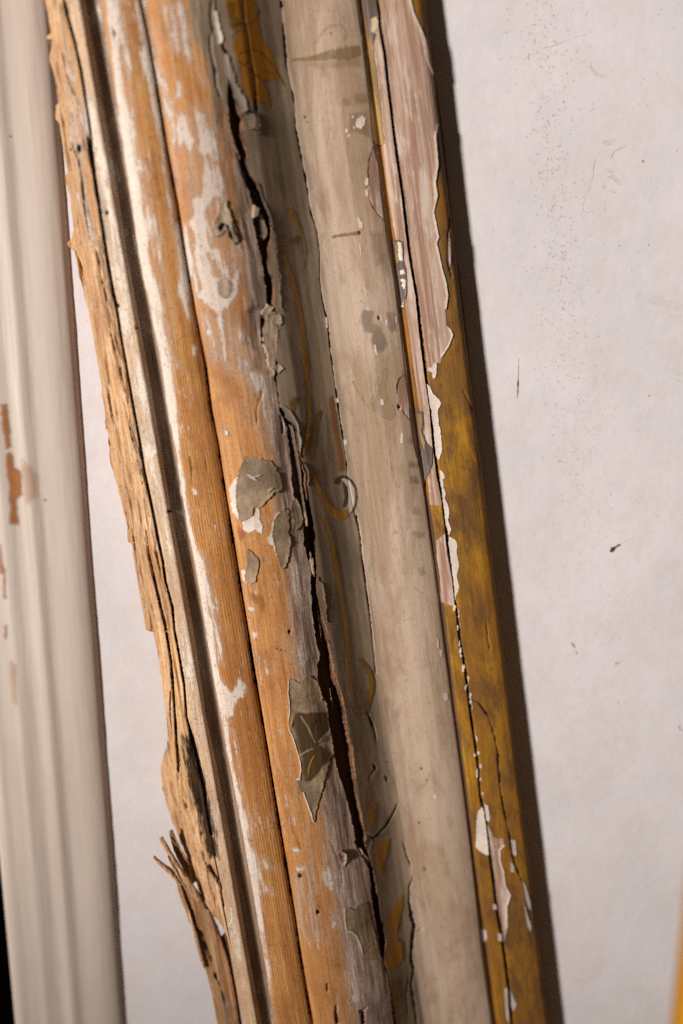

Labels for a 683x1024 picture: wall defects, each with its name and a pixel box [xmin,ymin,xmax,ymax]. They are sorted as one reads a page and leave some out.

peeling [345,0,473,709]
crack [63,2,224,900]
peeling [241,549,259,584]
crack [143,0,366,1023]
peeling [229,405,309,569]
crack [353,506,376,672]
peeling [287,676,334,823]
crack [367,804,397,839]
peeling [474,735,517,943]
peeling [523,881,531,931]
peeling [504,988,517,1022]